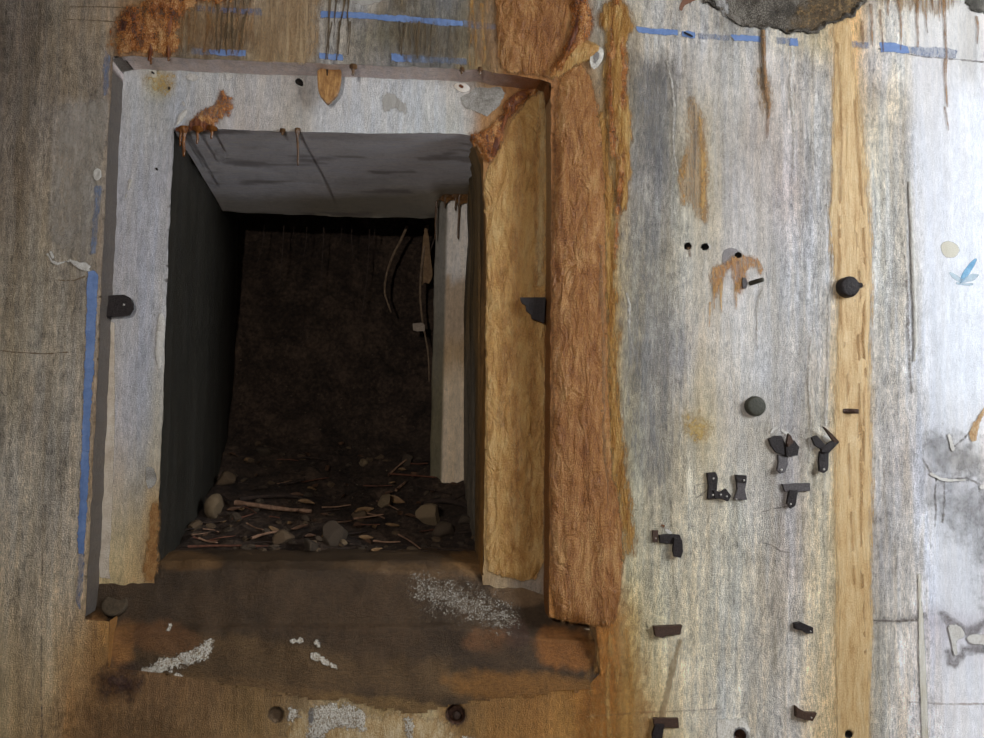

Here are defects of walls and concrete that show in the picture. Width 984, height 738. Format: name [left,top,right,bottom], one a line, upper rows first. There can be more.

corrosion [107,0,247,61]
spalling [679,0,867,34]
spalling [966,0,984,13]
corrosion [176,90,233,132]
water stain [941,241,960,258]
corrosion [469,0,635,627]
corrosion [709,255,763,326]
water stain [829,19,875,738]
crack [873,613,984,667]